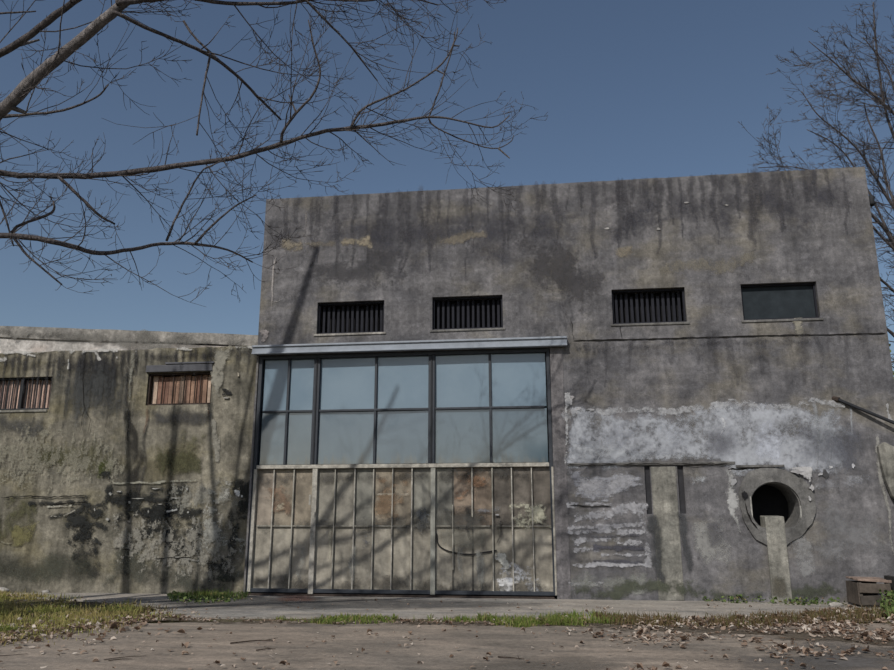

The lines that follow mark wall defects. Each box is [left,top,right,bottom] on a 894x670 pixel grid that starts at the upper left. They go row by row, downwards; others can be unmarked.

water stain [312,219,468,284]
water stain [520,218,603,299]
water stain [0,328,245,581]
peeling [564,392,594,464]
spalling [790,466,833,501]
spalling [106,479,245,583]
water stain [108,479,512,608]